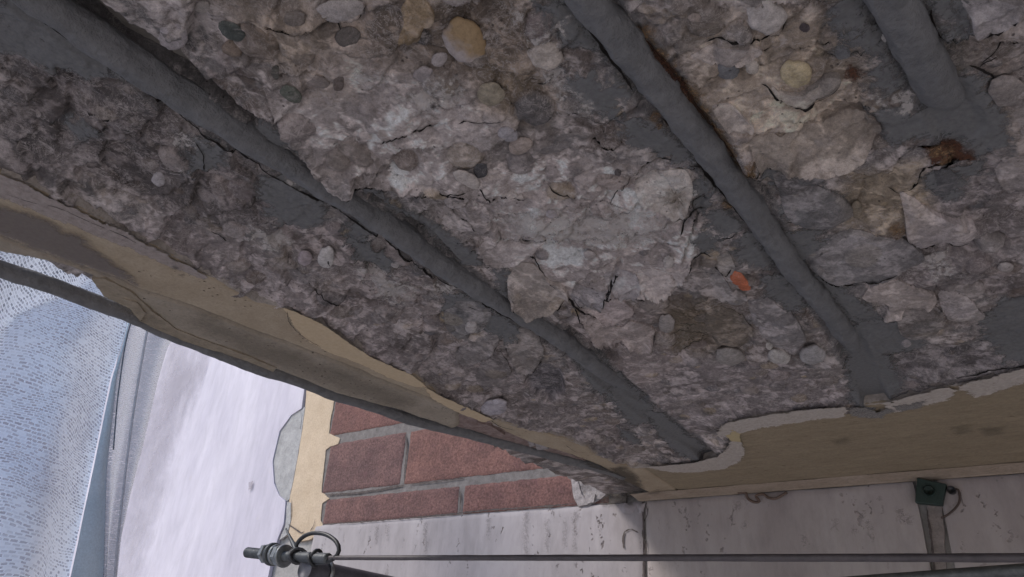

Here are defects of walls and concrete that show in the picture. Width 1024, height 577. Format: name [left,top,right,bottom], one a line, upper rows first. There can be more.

crack [970,23,1018,79]
rust [925,138,976,165]
crack [148,94,531,331]
spalling [74,0,1024,473]
crack [522,239,618,343]
crack [683,251,731,286]